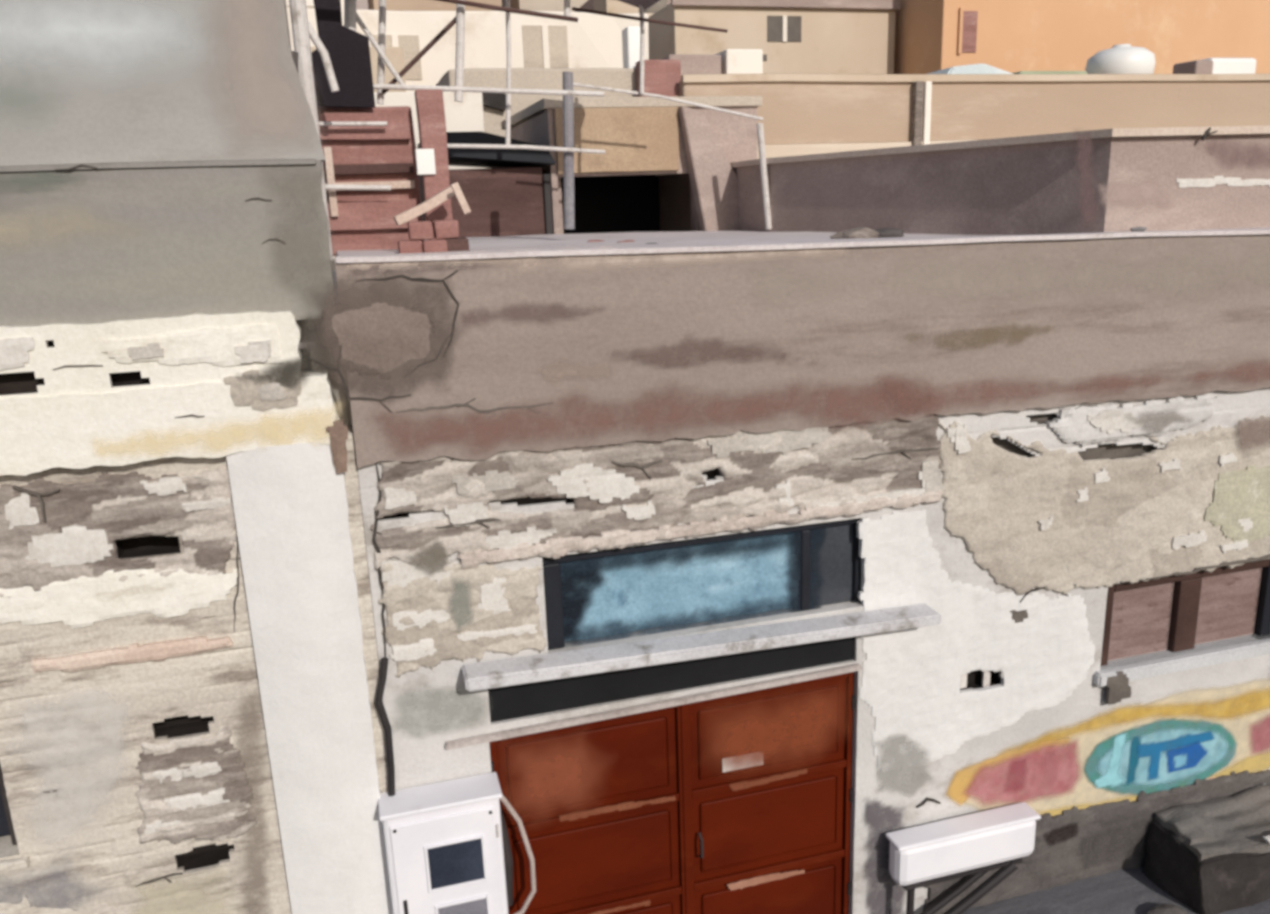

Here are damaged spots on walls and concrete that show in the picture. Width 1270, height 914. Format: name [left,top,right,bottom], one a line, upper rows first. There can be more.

crack [308,270,553,413]
spalling [0,466,238,629]
spalling [370,394,1270,772]
spalling [135,715,257,871]